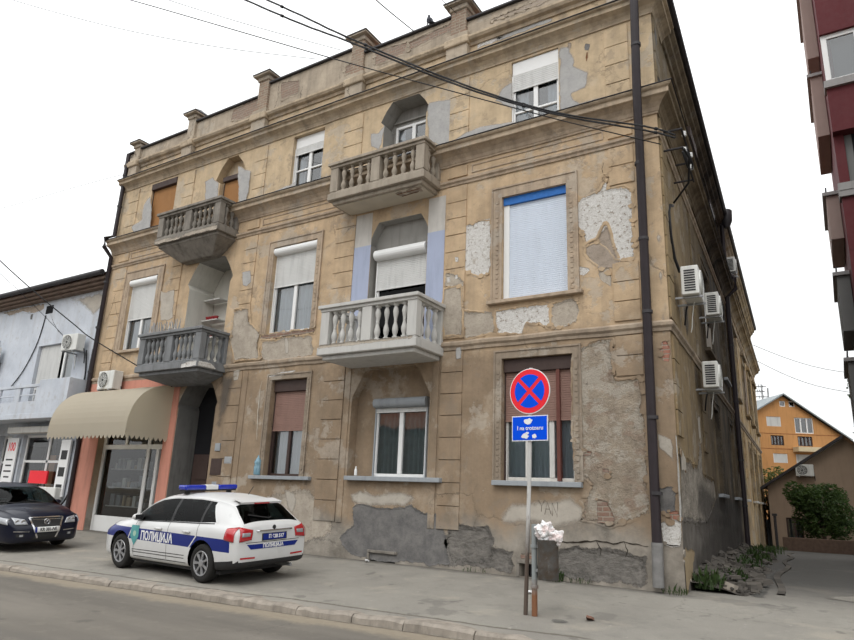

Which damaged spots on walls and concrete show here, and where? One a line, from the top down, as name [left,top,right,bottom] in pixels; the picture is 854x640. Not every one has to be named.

flaking render [578,173,638,286]
flaking render [442,219,582,359]
flaking render [267,489,332,542]
crack [562,540,678,557]
spalling [570,337,717,591]